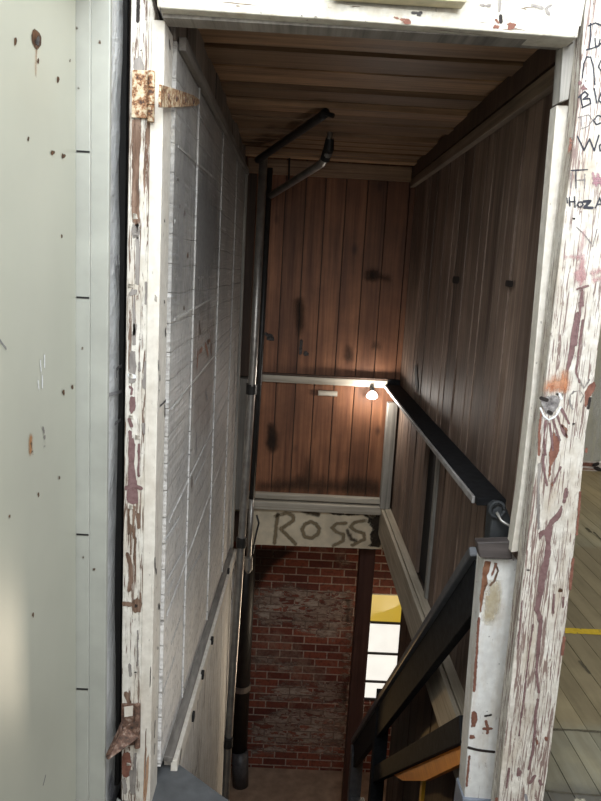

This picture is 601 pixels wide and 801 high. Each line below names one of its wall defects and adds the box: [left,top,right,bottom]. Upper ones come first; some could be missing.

corrosion [31,29,41,64]
peeling [124,118,150,613]
peeling [566,285,596,409]
peeling [473,561,499,692]
peeling [506,408,570,789]
peeling [121,746,137,795]
peeling [469,711,493,739]